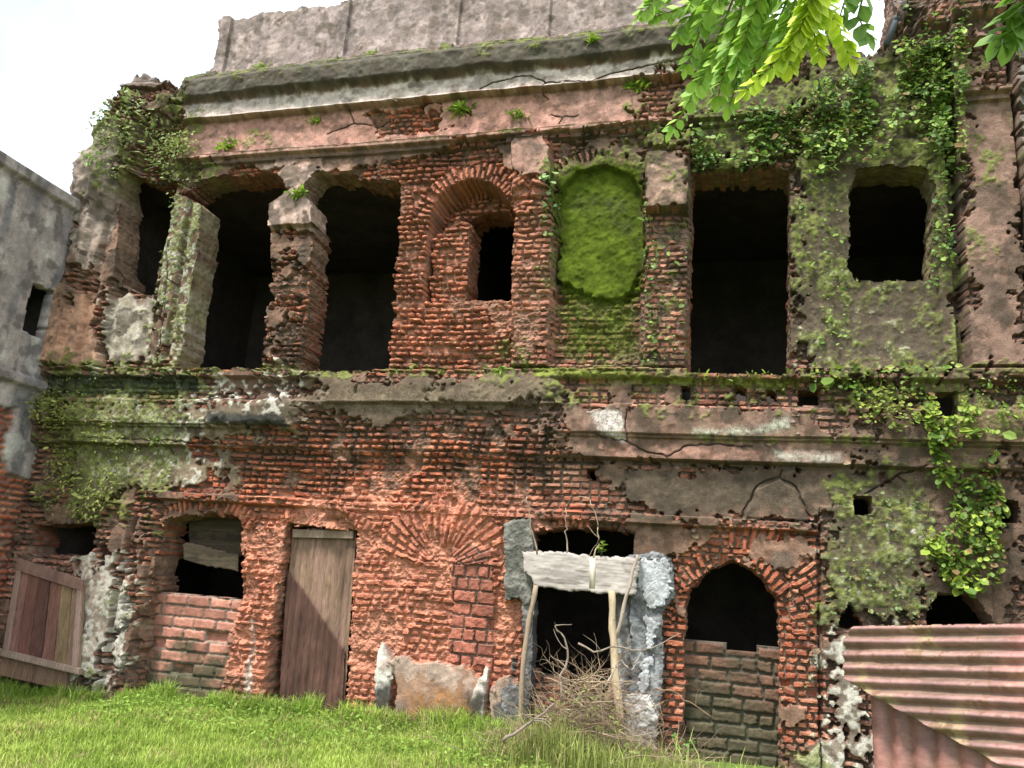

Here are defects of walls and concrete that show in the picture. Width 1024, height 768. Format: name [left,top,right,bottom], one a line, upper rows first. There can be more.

crack [328,115,396,134]
peeling [183,57,699,140]
crack [481,59,680,91]
spalling [261,276,313,371]
damp [45,373,199,416]
crack [599,415,751,465]
spalling [234,400,858,728]
damp [114,595,132,674]
crack [742,474,822,767]